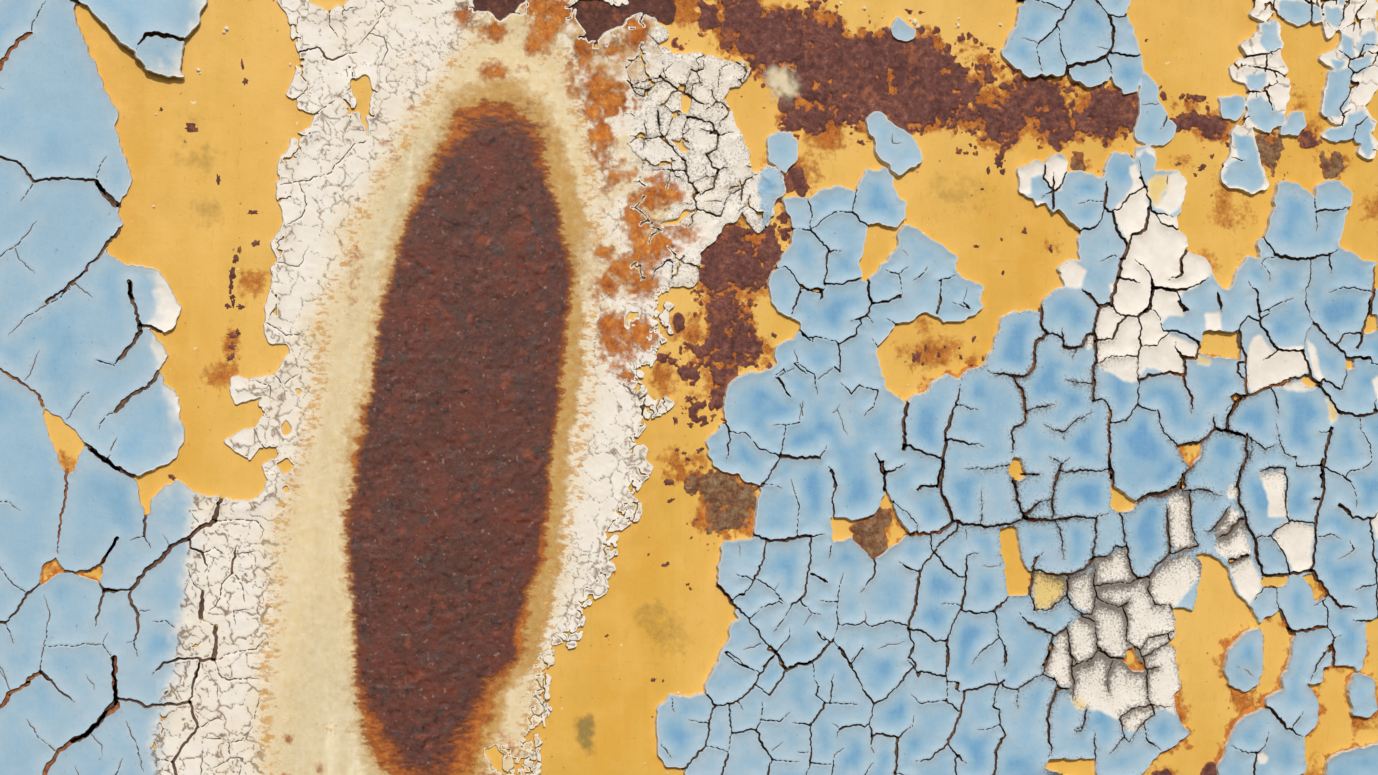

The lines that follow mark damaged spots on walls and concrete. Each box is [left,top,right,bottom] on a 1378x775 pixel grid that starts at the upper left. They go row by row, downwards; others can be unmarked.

crack [0,0,488,775]
rust [225,240,264,310]
peeling [0,0,531,775]
crack [553,259,692,646]
crack [556,33,757,261]
rust [259,0,1139,775]
peeling [484,0,1378,775]
crack [661,160,1378,775]
rust [1159,85,1233,177]
rust [1148,685,1192,775]
rust [1200,609,1327,775]
rust [1306,645,1378,775]